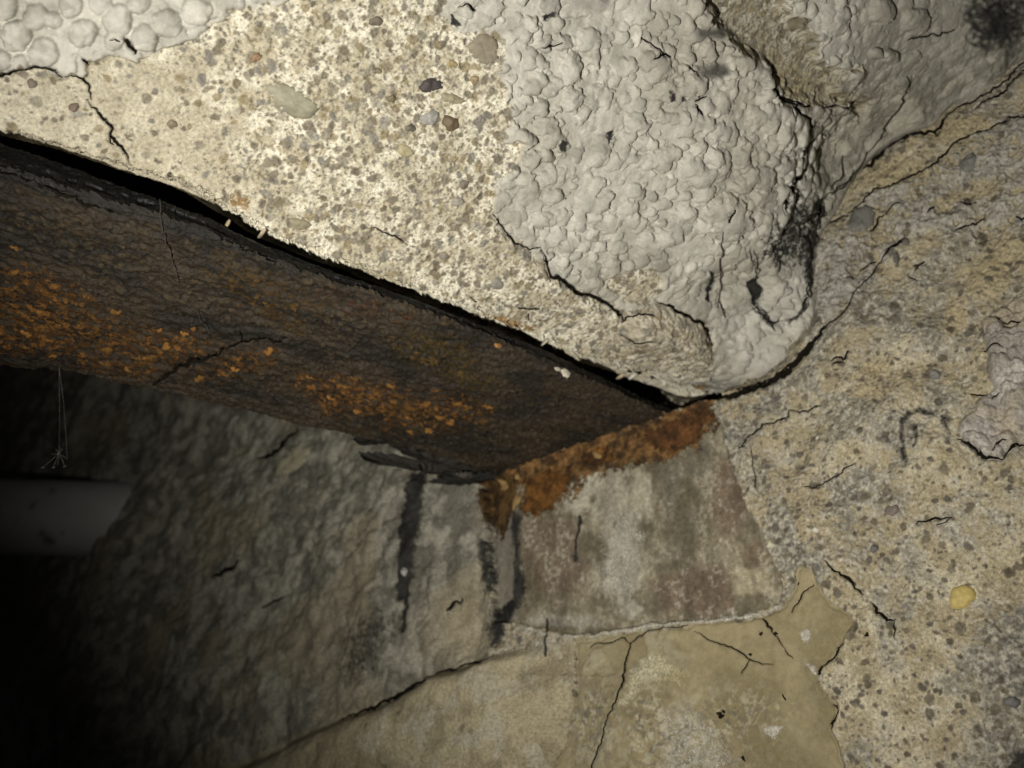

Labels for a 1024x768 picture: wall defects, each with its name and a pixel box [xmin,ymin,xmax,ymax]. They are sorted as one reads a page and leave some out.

crack [0,59,131,165]
rust [0,246,496,439]
spalling [0,0,707,397]
crack [493,214,713,347]
crack [717,62,1024,401]
peeling [353,437,386,446]
peeling [410,463,501,486]
rust [476,385,720,541]
leakage [477,539,499,592]
leakage [487,511,526,647]
crack [792,561,896,639]
crack [590,625,764,768]